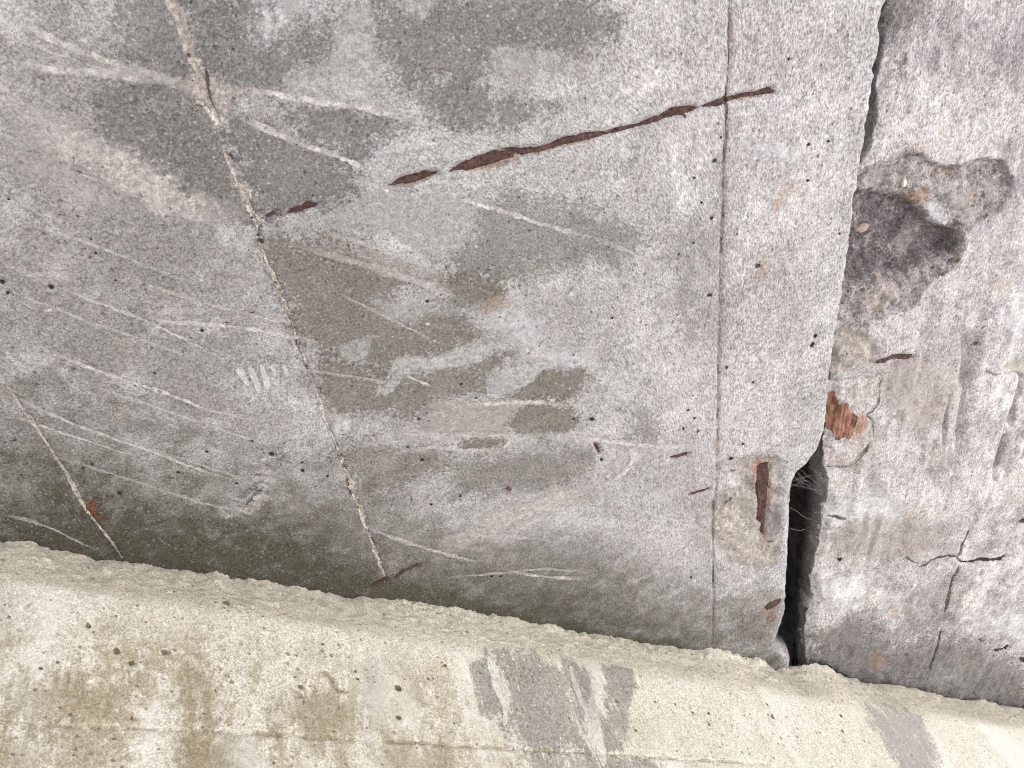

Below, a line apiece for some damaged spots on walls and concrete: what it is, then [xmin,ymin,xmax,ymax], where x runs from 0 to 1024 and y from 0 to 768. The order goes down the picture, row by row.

crack [165,0,385,576]
crack [0,374,123,557]
crack [907,530,1004,667]